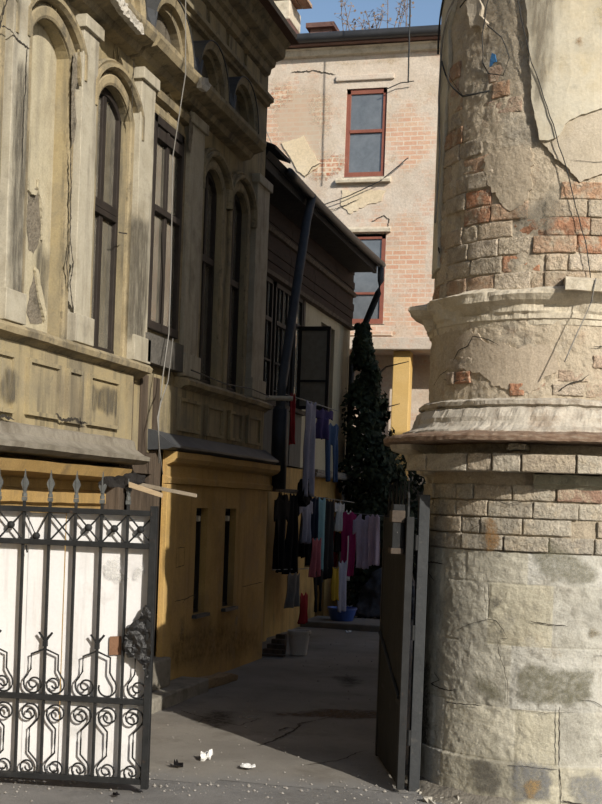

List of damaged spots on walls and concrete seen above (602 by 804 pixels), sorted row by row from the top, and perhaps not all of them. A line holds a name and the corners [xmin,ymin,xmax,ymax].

spalling [110,0,144,35]
crack [0,0,30,178]
flaking render [432,0,602,300]
peeling [27,179,46,253]
crack [66,154,74,313]
peeling [27,267,47,324]
crack [434,336,498,385]
leakage [92,386,117,415]
crack [431,672,481,706]
crack [457,585,601,804]
leakage [470,760,501,794]
leakage [511,761,552,800]